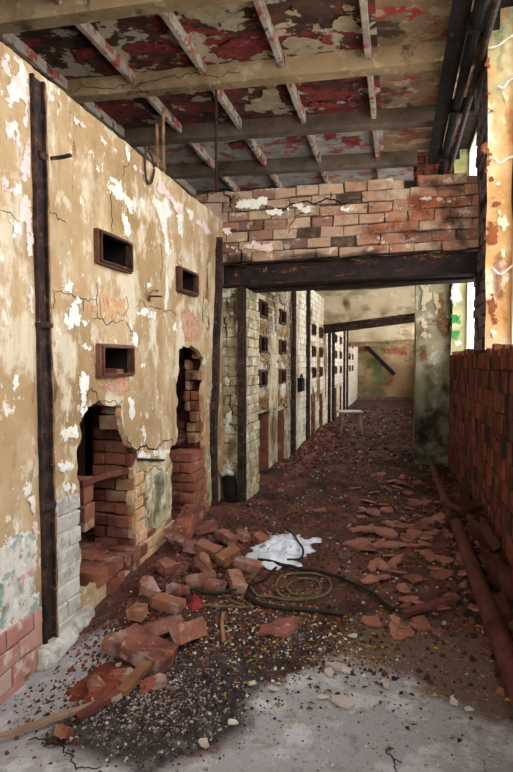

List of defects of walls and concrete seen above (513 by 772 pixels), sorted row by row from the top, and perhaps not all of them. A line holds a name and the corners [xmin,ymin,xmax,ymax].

peeling [282,4,360,50]
crack [65,71,240,92]
peeling [244,85,286,112]
peeling [235,196,311,216]
crack [268,193,364,232]
crack [52,285,204,343]
damp [437,293,451,337]
spalling [182,345,212,503]
flaking render [60,371,174,564]
crack [126,436,173,482]
peeling [0,480,42,705]
crack [28,737,101,769]